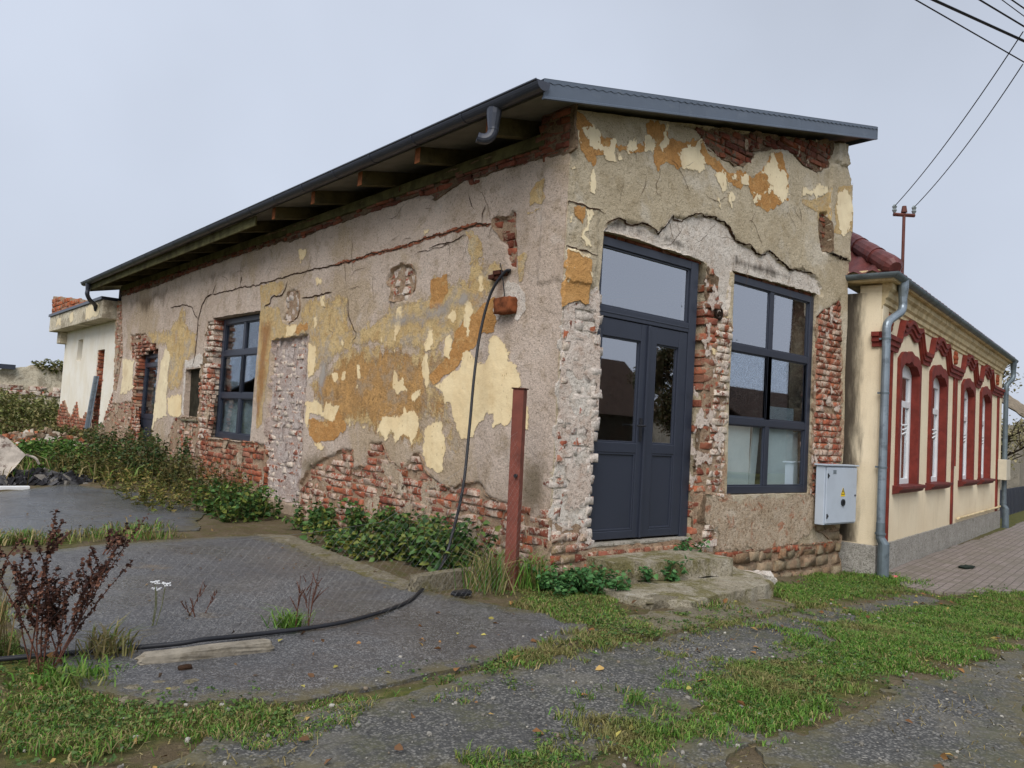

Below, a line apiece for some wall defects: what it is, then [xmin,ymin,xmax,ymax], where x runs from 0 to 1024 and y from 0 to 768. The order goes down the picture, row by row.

crack [152,192,491,366]
flaking render [0,104,853,579]
crack [568,161,763,286]
crack [785,253,848,307]